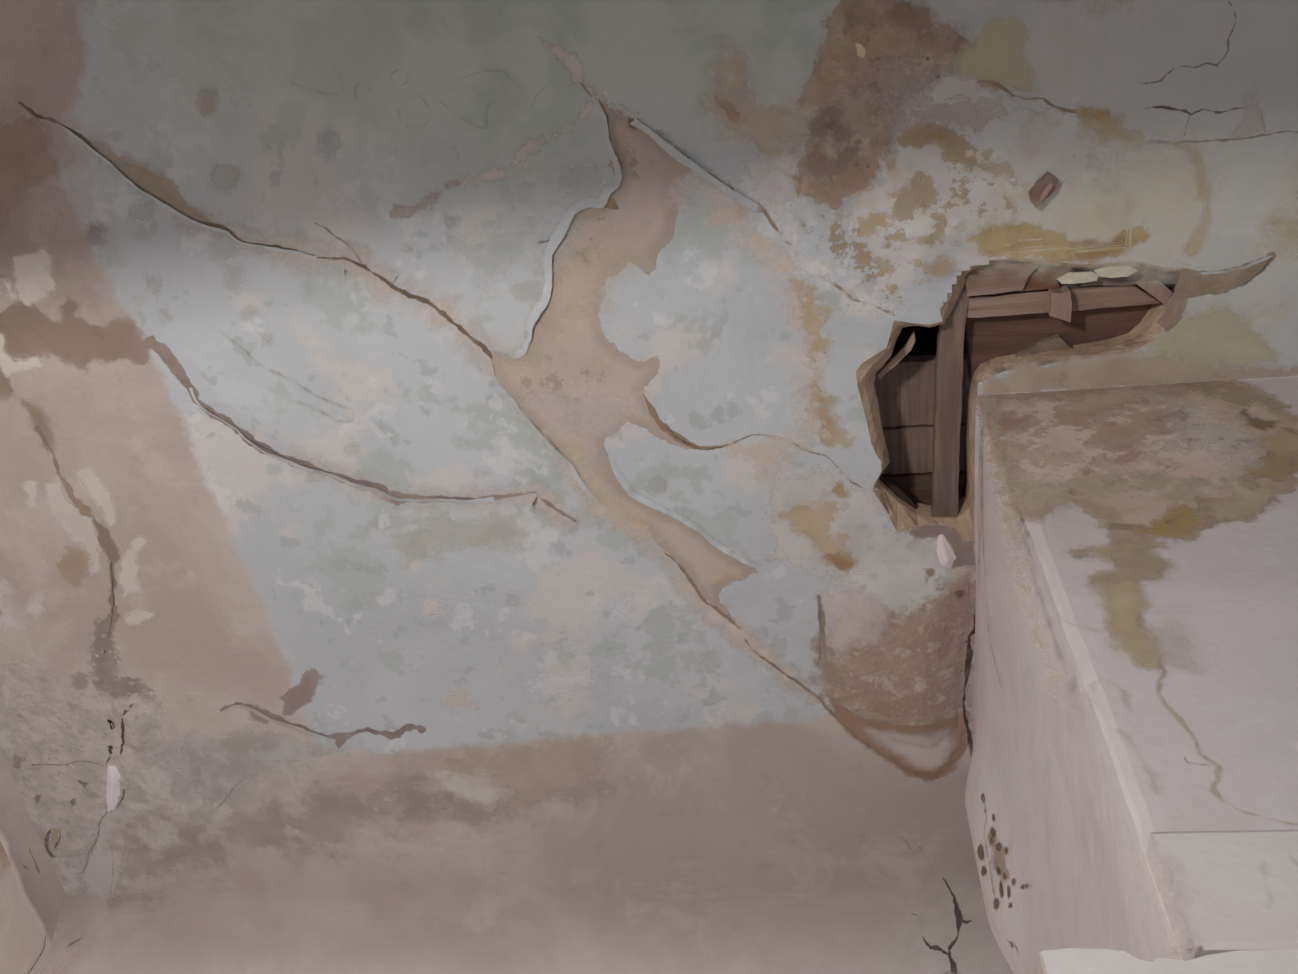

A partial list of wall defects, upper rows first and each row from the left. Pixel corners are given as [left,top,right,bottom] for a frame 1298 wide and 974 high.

leakage [0,118,149,450]
crack [19,102,496,376]
leakage [802,147,1210,302]
peeling [1057,265,1138,284]
flaking render [1157,252,1276,332]
crack [23,425,154,682]
crack [145,336,576,522]
peeling [491,100,989,737]
leakage [974,309,1298,734]
crack [220,702,426,748]
crack [912,878,972,974]
mould [977,793,1028,909]